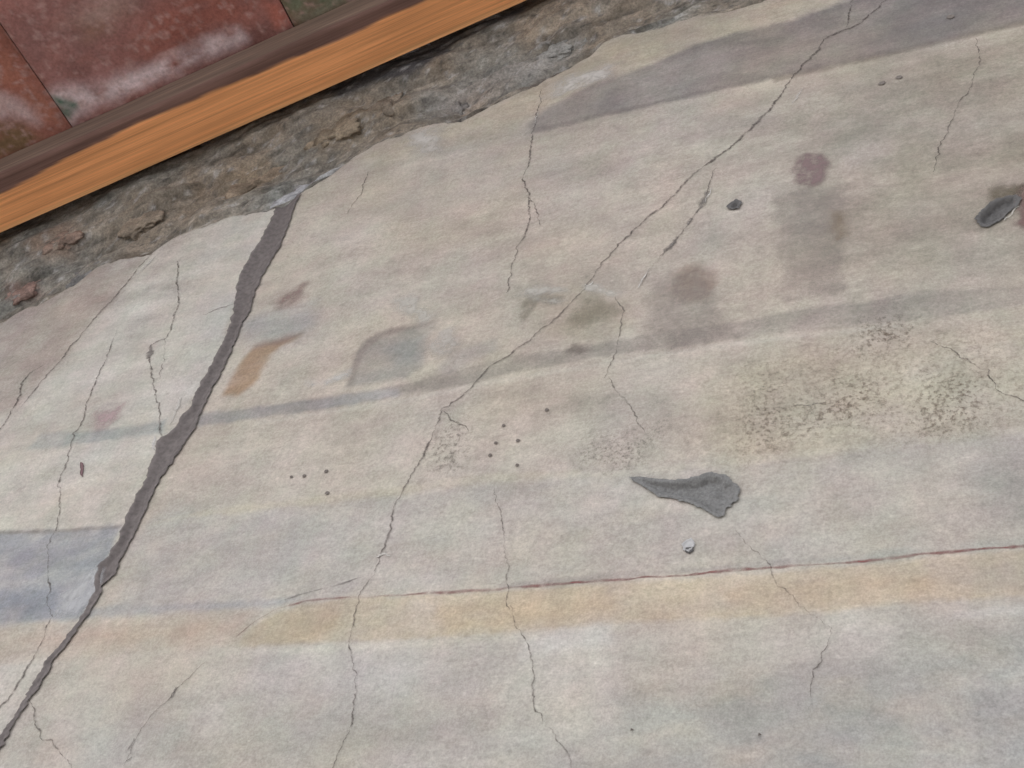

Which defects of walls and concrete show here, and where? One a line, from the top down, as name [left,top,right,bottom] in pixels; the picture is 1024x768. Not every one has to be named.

water stain [797,154,828,185]
flaking render [974,194,1022,227]
crack [403,1,881,489]
crack [0,193,301,755]
flaking render [630,472,740,517]